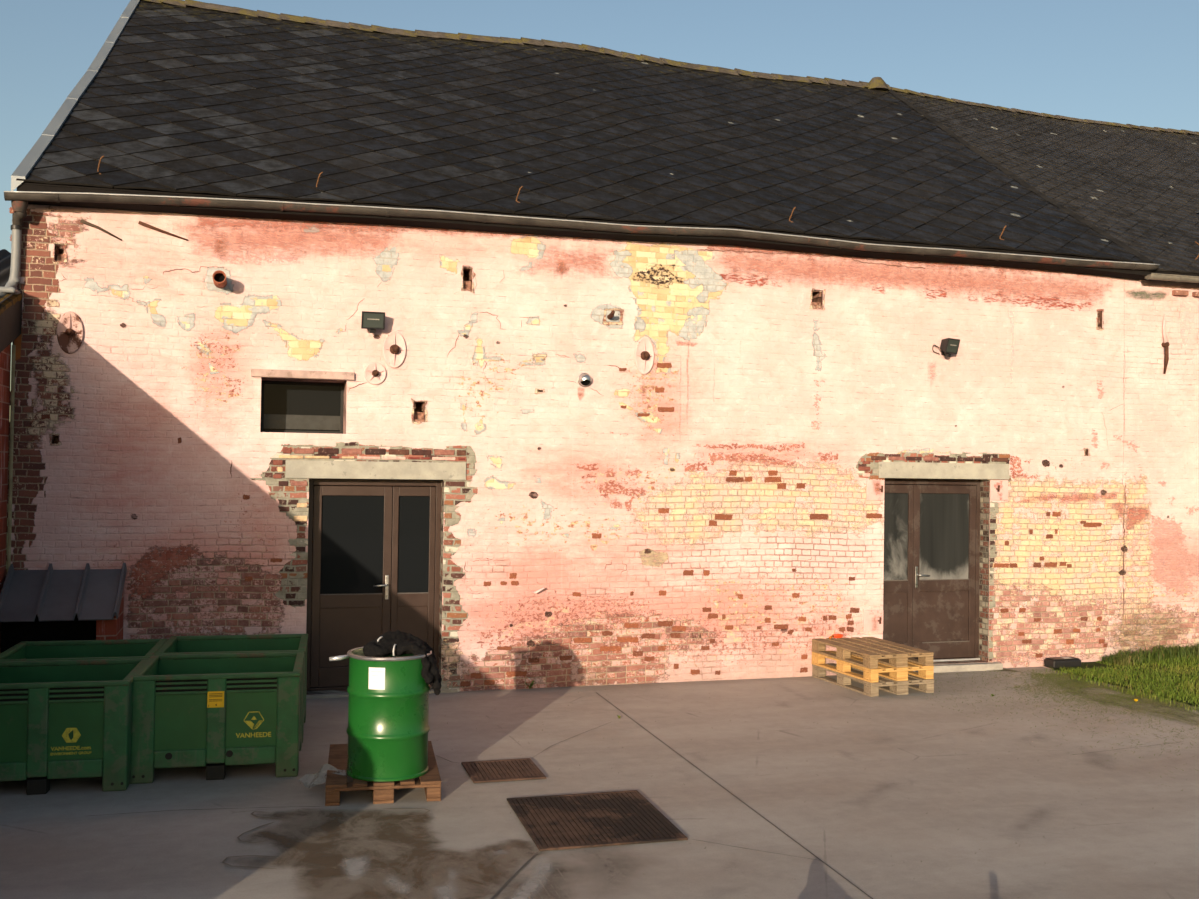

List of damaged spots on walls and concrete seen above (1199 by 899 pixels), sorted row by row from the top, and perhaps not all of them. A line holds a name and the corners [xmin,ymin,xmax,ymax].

flaking render [6,206,88,576]
peeling [84,267,343,407]
spalling [439,254,475,293]
peeling [446,312,547,435]
peeling [511,235,546,271]
peeling [591,241,728,436]
peeling [810,288,827,430]
flaking render [467,443,884,554]
flaking render [988,430,1199,667]
flaking render [459,569,860,691]